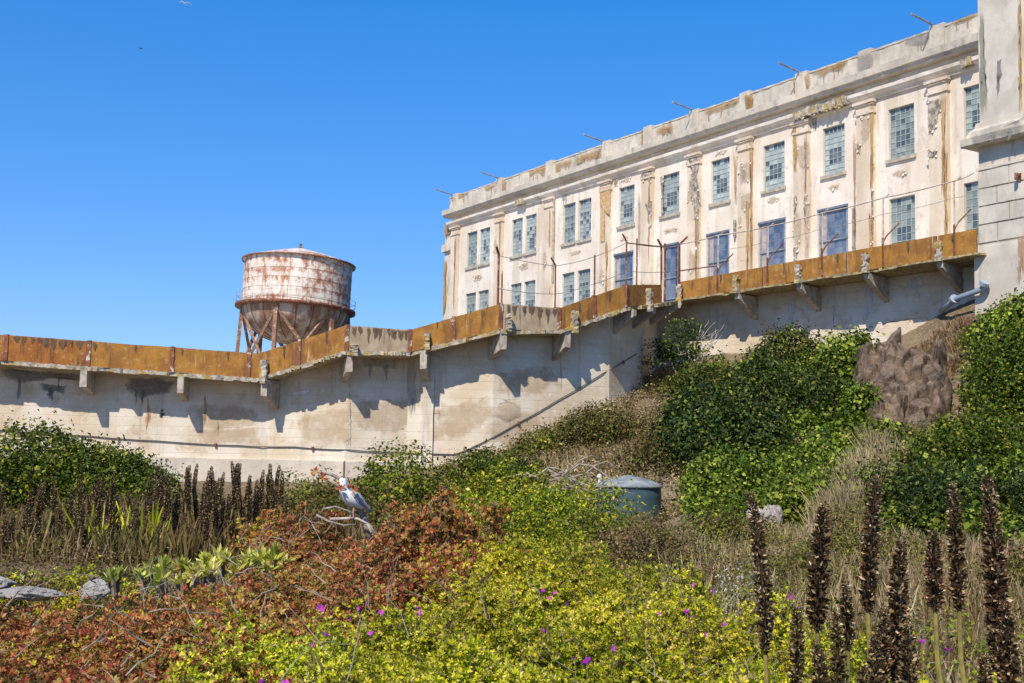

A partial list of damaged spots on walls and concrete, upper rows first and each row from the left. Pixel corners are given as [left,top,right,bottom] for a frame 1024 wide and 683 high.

leakage [5,368,79,402]
leakage [126,378,173,405]